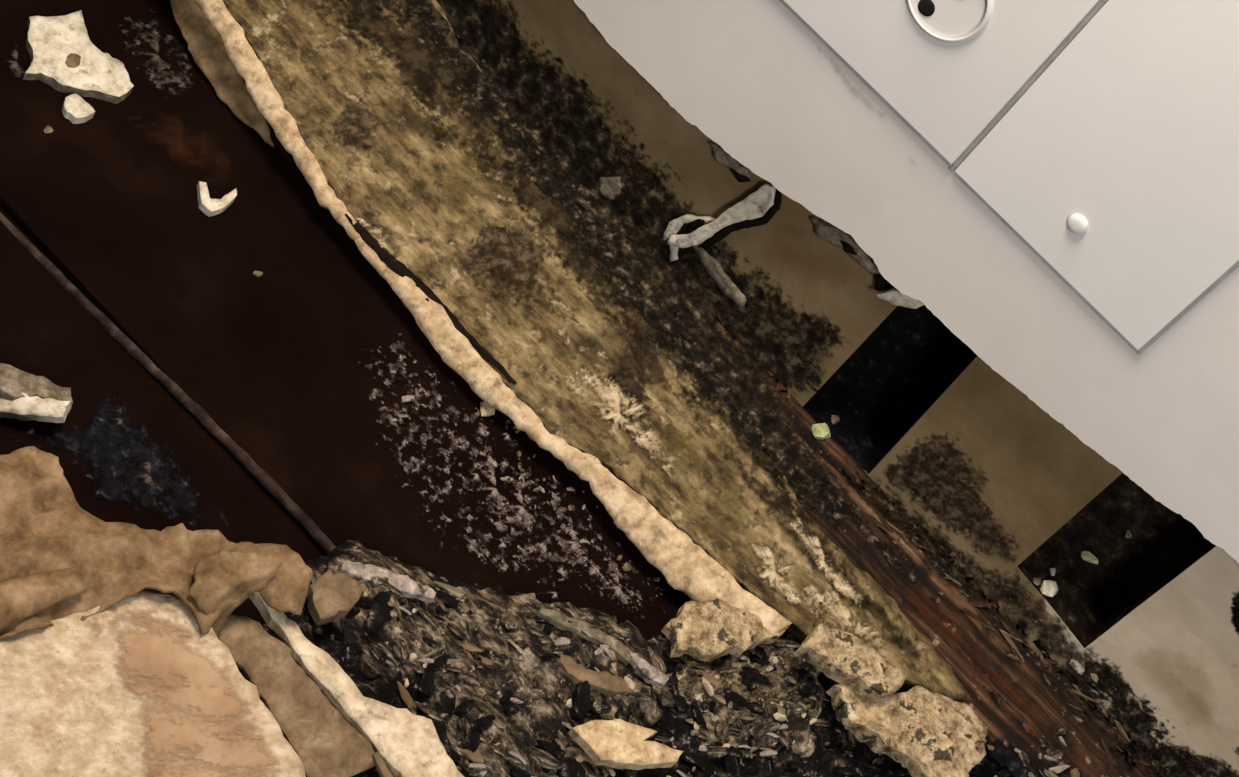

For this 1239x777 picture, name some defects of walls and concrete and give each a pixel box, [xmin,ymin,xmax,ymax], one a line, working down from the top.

spalling [811,217,925,309]
damp [314,0,1239,777]
spalling [1231,593,1239,633]